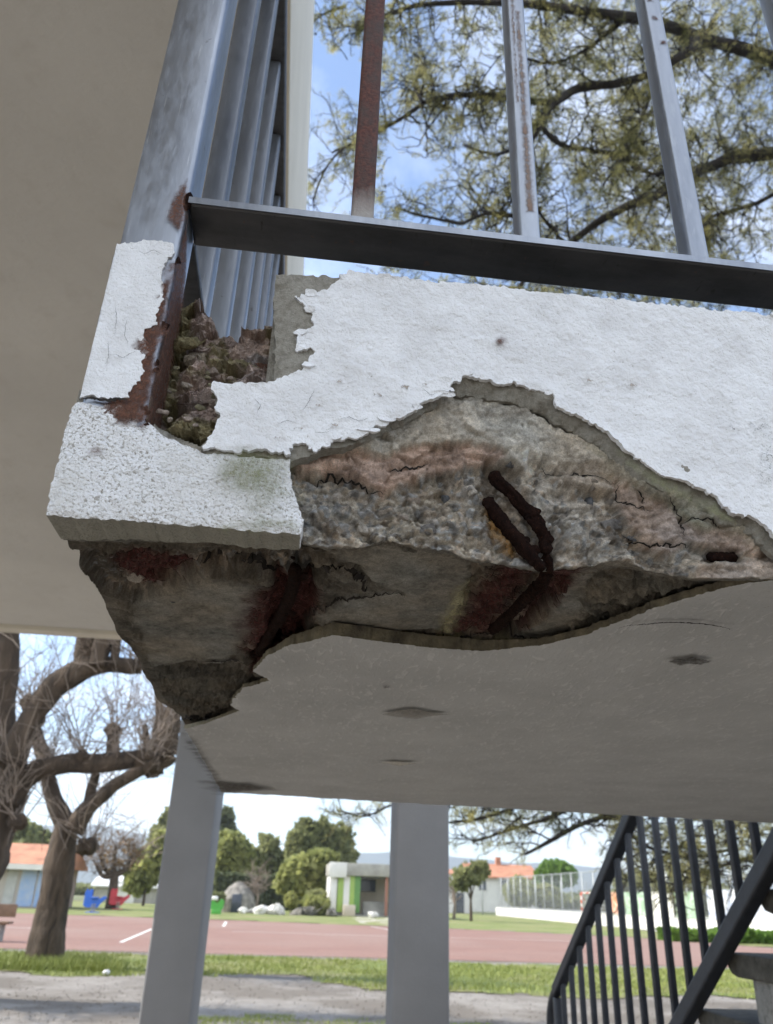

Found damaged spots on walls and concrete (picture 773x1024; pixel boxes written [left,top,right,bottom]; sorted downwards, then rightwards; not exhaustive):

corrosion [511,0,533,211]
corrosion [104,185,193,429]
peeling [304,289,317,313]
spalling [154,298,272,452]
corrosion [113,547,192,581]
crack [200,549,280,571]
crack [304,563,401,619]
crack [308,465,425,494]
spalling [63,371,773,725]
corrosion [454,513,530,633]
corrosion [518,569,579,628]
crack [541,460,719,548]